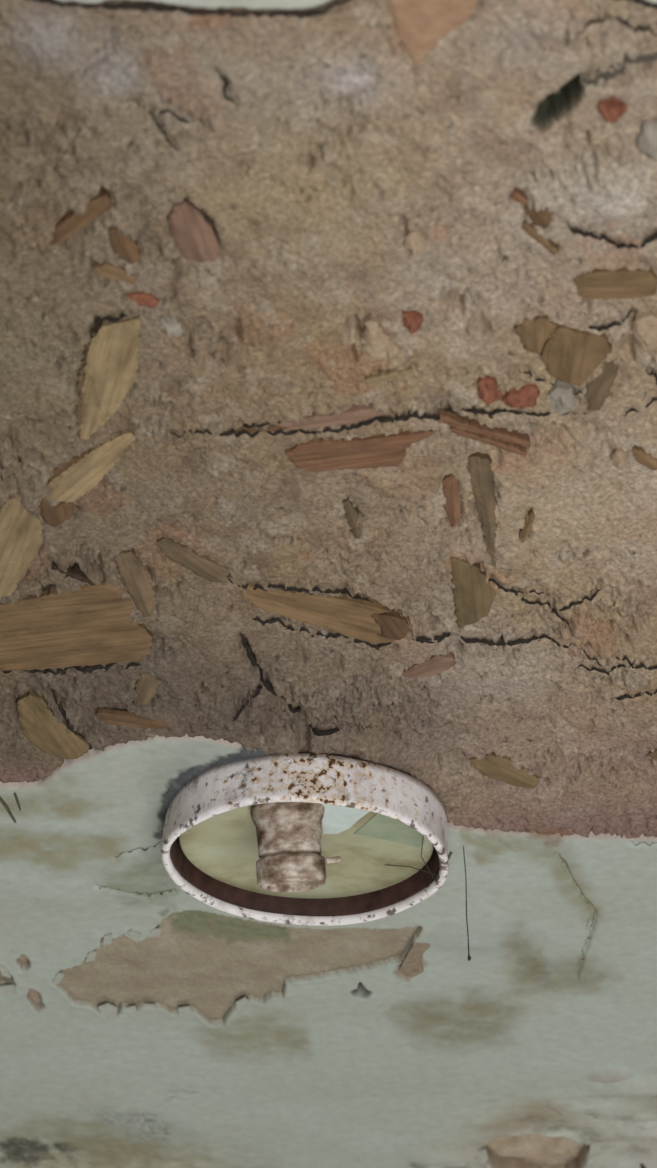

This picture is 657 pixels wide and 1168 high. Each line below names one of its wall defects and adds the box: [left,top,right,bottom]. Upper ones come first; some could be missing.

crack [32,0,351,19]
crack [566,0,657,46]
spalling [0,0,657,839]
crack [228,571,657,736]
peeling [53,910,430,1021]
crack [560,856,595,972]
spalling [477,1134,602,1167]